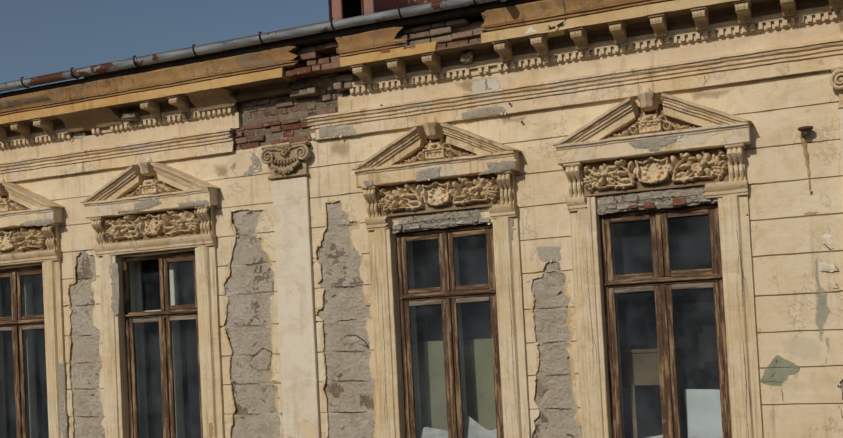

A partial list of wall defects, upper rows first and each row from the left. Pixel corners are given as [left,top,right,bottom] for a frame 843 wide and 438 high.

flaking render [230,41,357,177]
rust [800,136,813,195]
spalling [58,250,105,438]
spalling [108,263,119,316]
spalling [224,208,282,438]
spalling [313,197,378,438]
spalling [527,251,582,438]
damp [816,261,829,347]